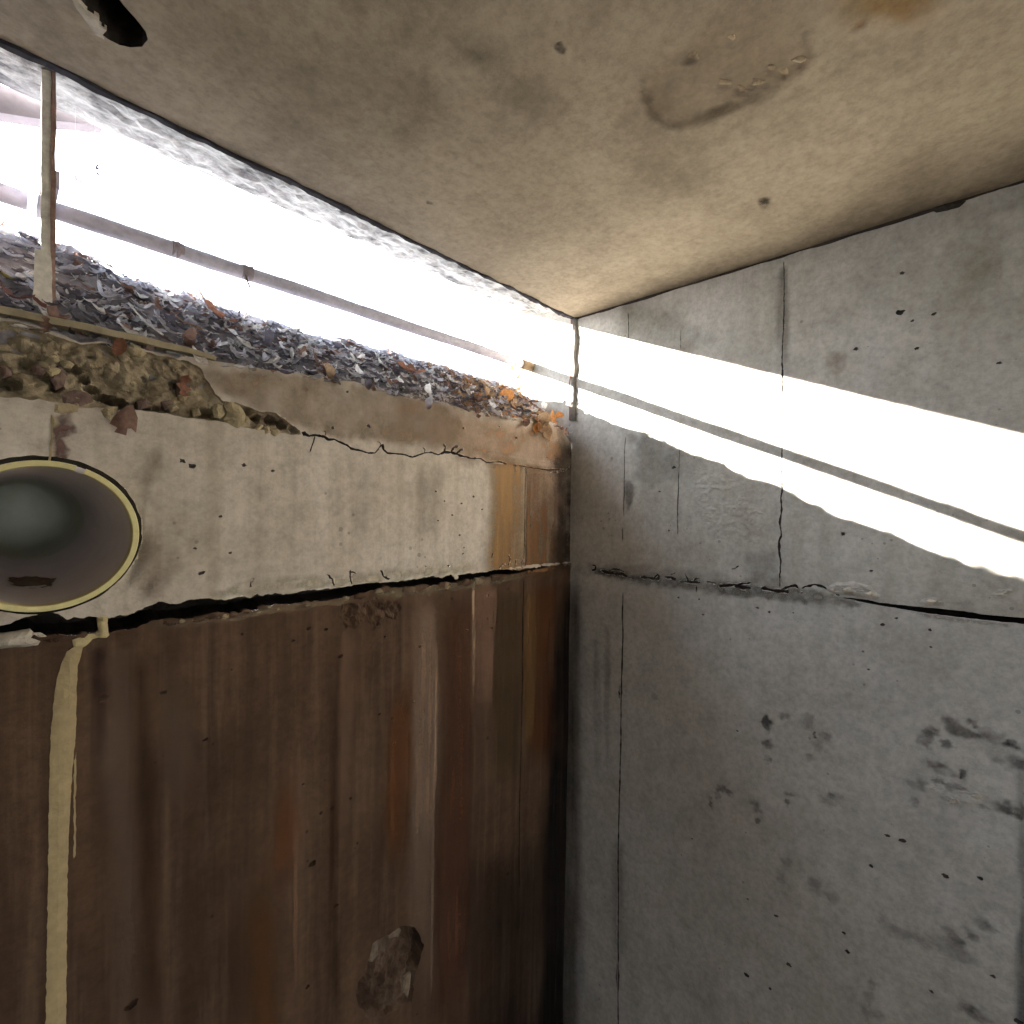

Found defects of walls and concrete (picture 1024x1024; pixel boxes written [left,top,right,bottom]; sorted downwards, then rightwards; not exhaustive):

peeling [73,0,107,39]
leakage [705,105,739,120]
spalling [0,321,301,461]
crack [302,431,565,496]
rust [437,421,564,574]
crack [0,528,548,888]
crack [592,263,1024,1024]
spalling [356,925,424,1018]